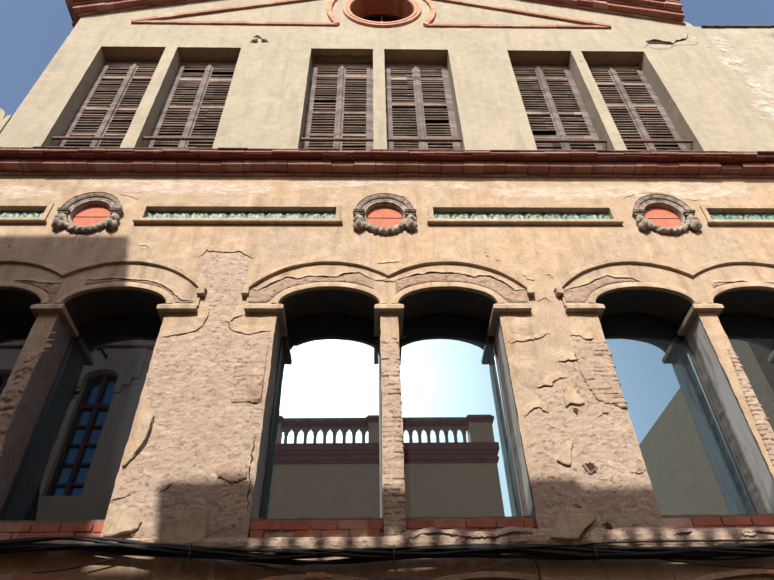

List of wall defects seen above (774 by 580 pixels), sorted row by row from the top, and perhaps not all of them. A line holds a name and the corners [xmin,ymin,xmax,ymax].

crack [644,34,688,48]
spalling [85,275,195,302]
crack [375,259,401,282]
spalling [0,350,39,461]
spalling [103,243,375,545]
spalling [520,327,664,540]
flaking render [727,348,774,466]